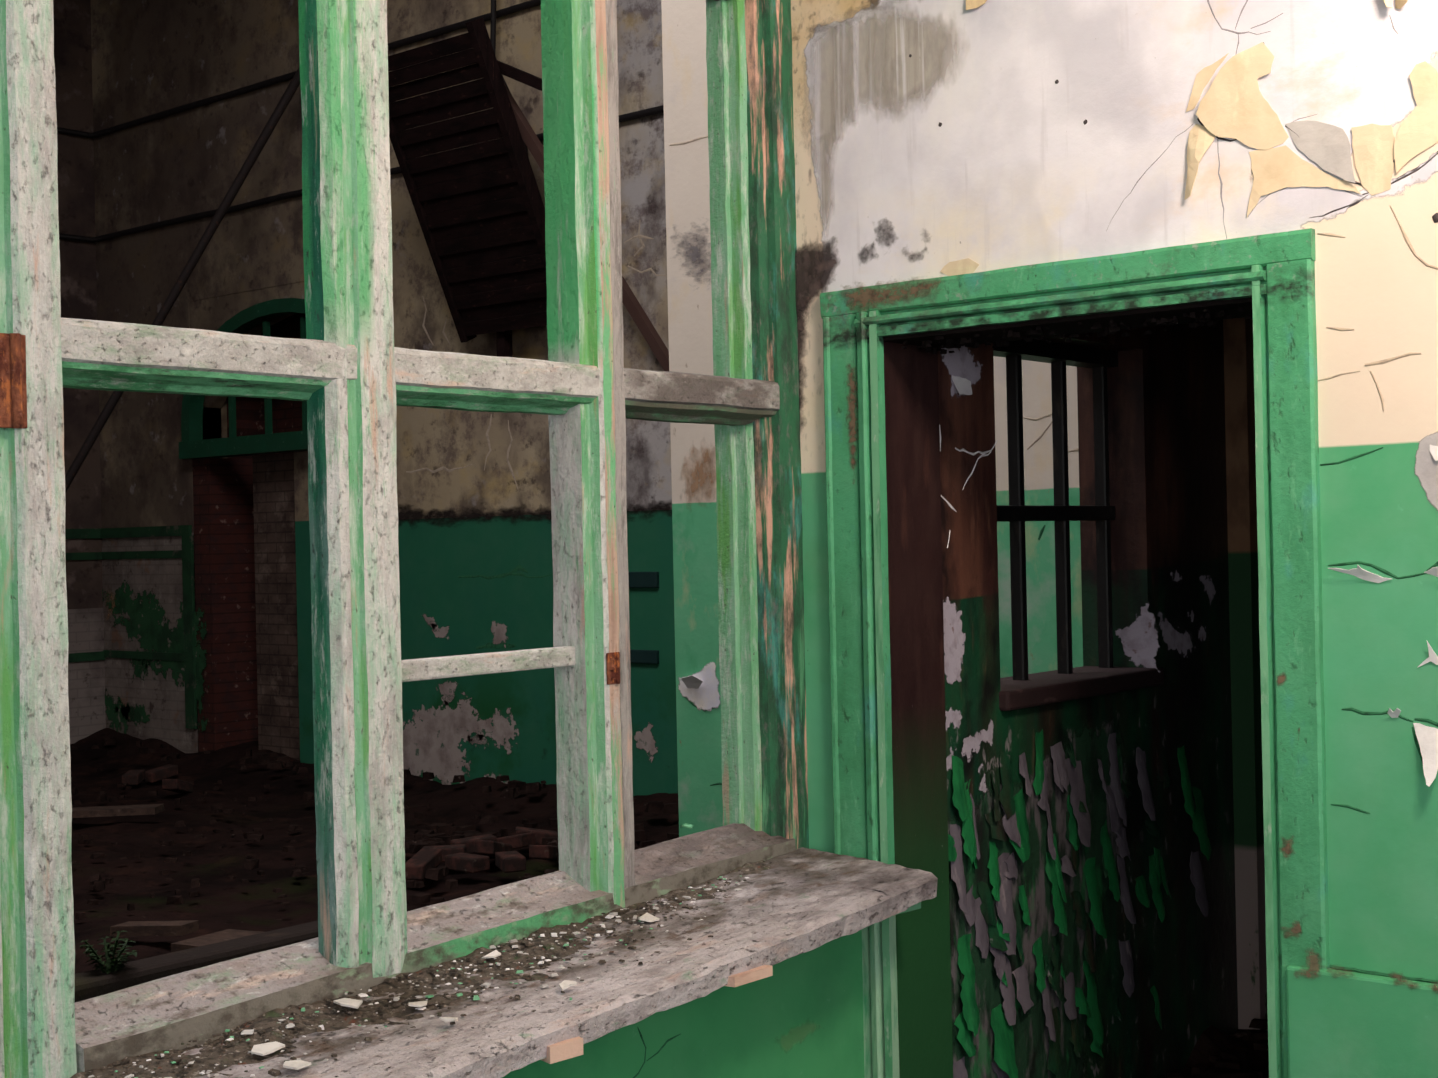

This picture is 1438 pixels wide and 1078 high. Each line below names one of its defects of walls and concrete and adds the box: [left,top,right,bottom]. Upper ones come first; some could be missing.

crack [1207,0,1283,54]
water stain [860,221,894,262]
water stain [812,0,950,224]
peeling [804,0,1438,293]
crack [1107,118,1288,239]
crack [1310,151,1438,270]
water stain [795,239,940,432]
crack [1317,352,1421,411]
peeling [943,597,966,684]
peeling [403,680,519,785]
peeling [1341,707,1438,787]
peeling [945,707,1212,1078]